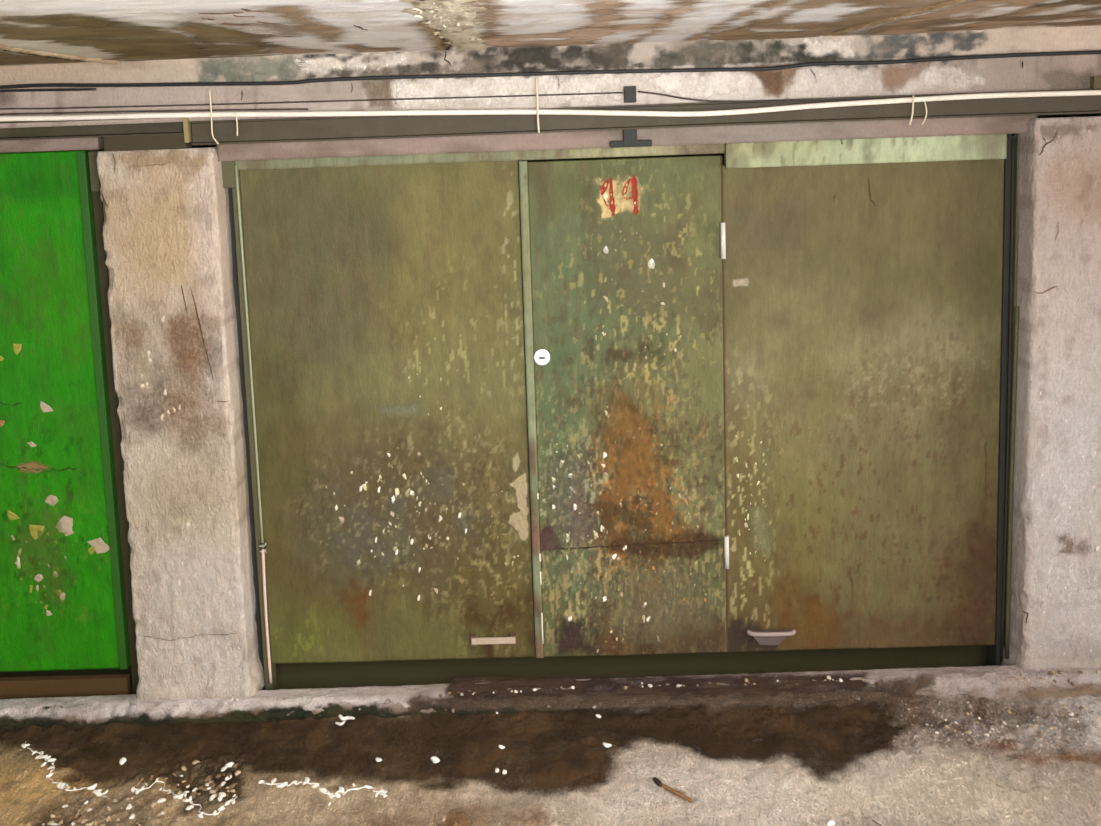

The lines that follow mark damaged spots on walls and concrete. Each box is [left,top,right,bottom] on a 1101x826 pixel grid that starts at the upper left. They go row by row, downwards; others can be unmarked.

water stain [0,0,1101,107]
peeling [597,230,686,314]
peeling [17,462,48,472]
peeling [7,495,74,616]
peeling [87,537,110,555]
peeling [325,447,477,601]
peeling [490,451,529,541]
corrosion [596,397,716,589]
water stain [0,672,1033,813]